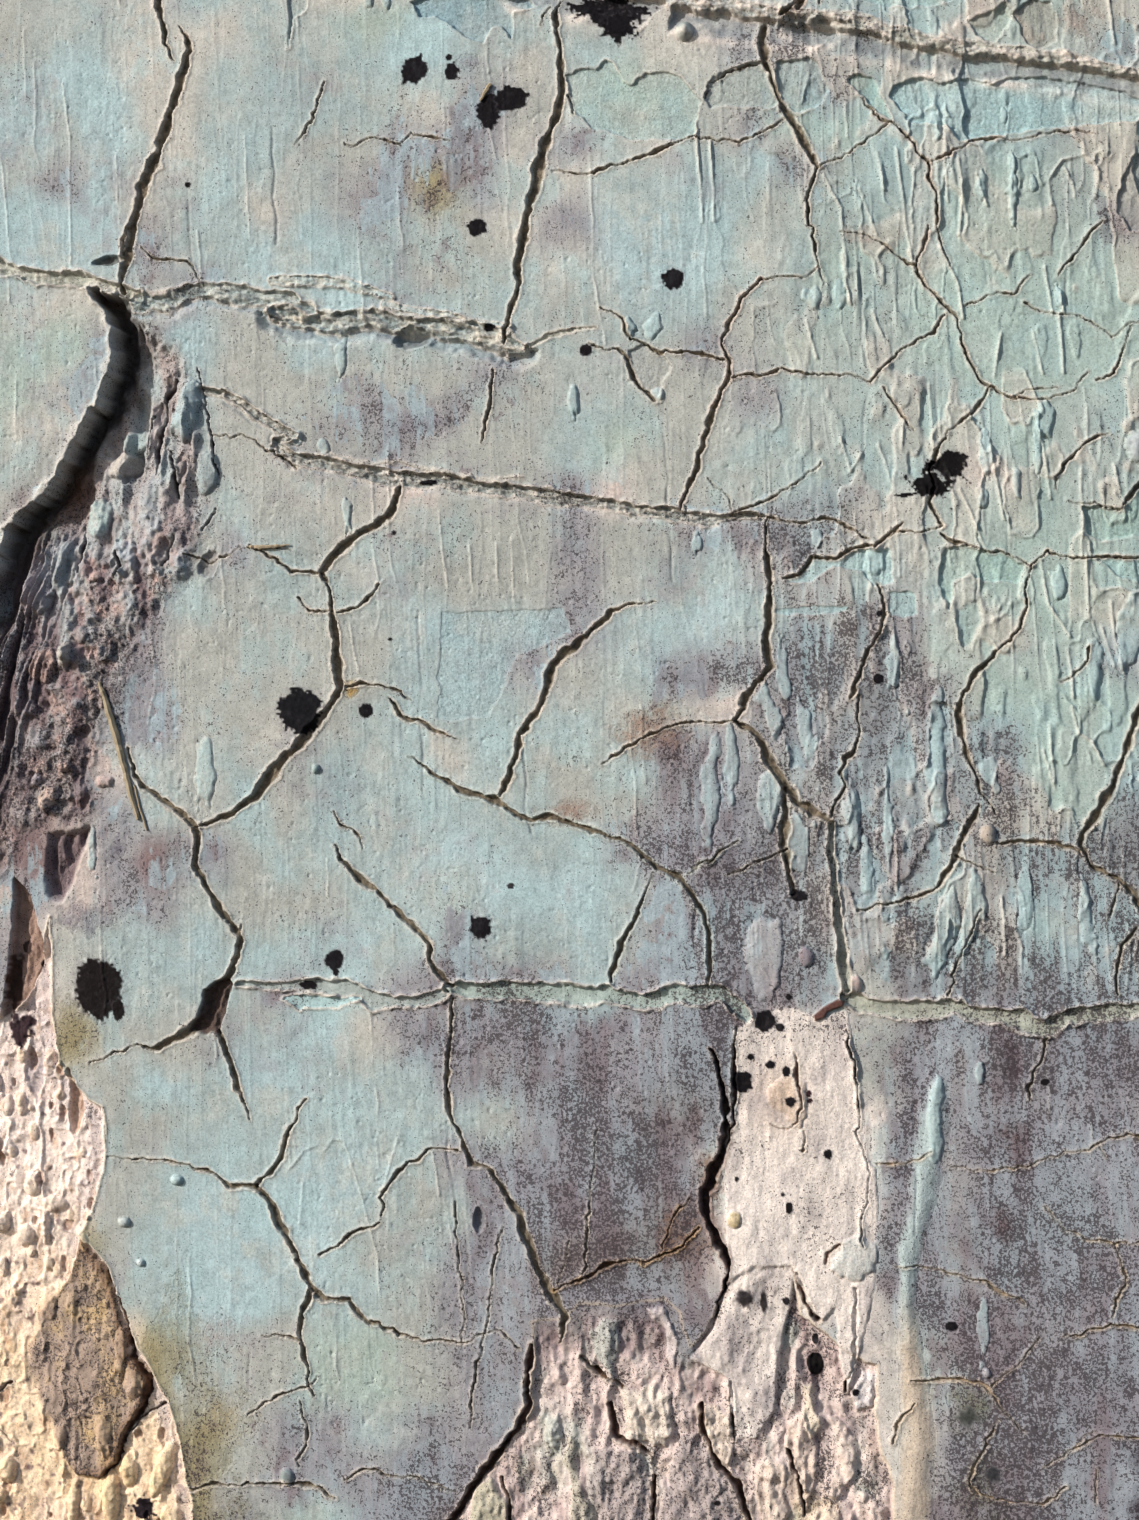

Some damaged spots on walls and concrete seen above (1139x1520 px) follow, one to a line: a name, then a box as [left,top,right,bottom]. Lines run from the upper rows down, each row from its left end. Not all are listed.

spalling [91,255,121,267]
crack [0,6,715,360]
crack [127,0,1139,1344]
spalling [0,290,224,1520]
crack [89,1021,251,1120]
spalling [189,979,233,1036]
crack [105,1099,521,1500]
crack [580,1354,625,1390]
flaking render [447,999,895,1520]
crack [892,1206,1139,1508]